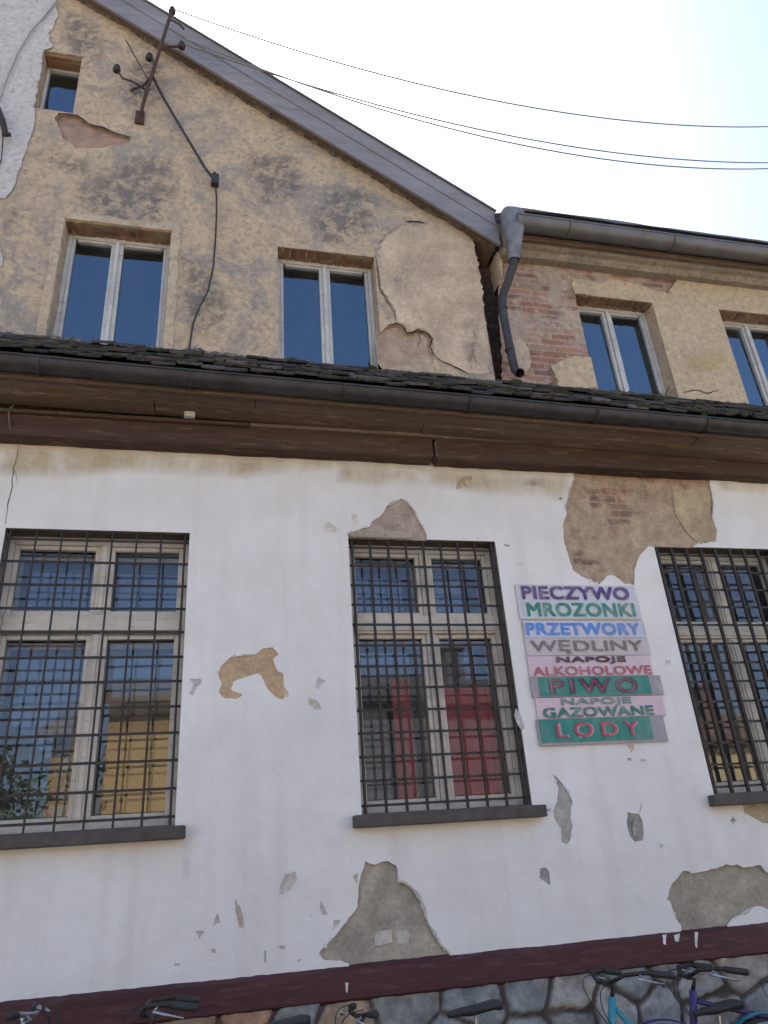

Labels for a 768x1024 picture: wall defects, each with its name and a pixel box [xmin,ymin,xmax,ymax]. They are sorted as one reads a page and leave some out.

spalling [54,113,132,148]
spalling [376,326,433,369]
flaking render [498,262,678,390]
spalling [324,499,427,544]
flaking render [559,473,716,585]
peeling [218,648,289,699]
peeling [553,775,573,844]
peeling [627,802,643,842]
spalling [319,861,451,965]
spalling [667,864,768,930]